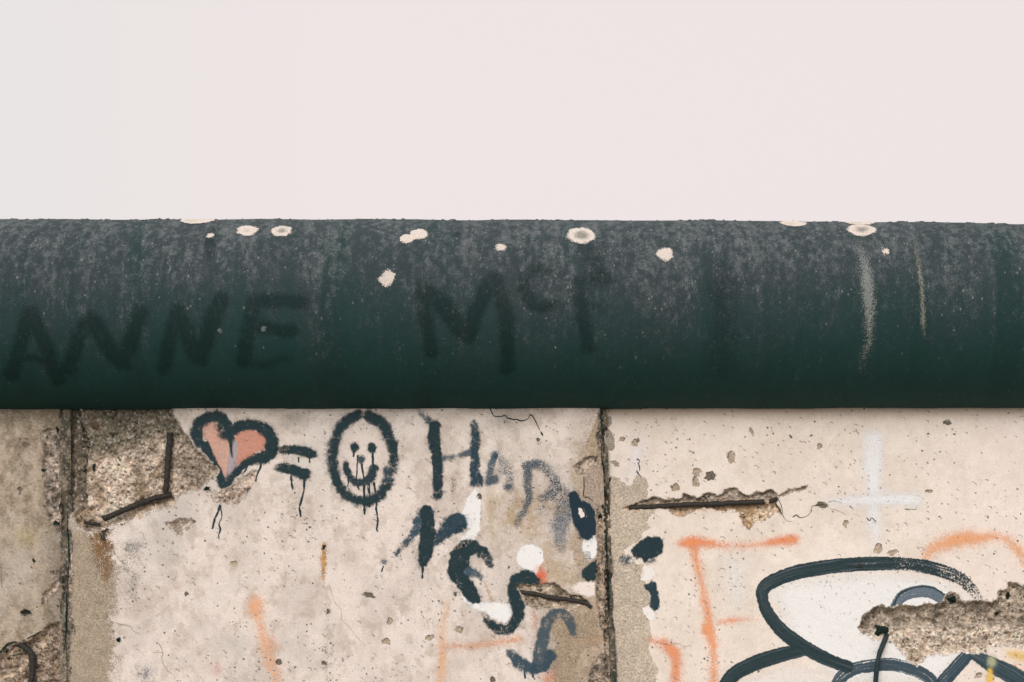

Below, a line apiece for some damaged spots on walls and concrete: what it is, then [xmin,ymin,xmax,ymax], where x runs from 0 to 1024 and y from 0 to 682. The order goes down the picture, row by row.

water stain [854,239,879,375]
water stain [913,241,927,336]
spalling [0,409,257,682]
peeling [516,410,808,682]
spalling [857,581,1024,666]